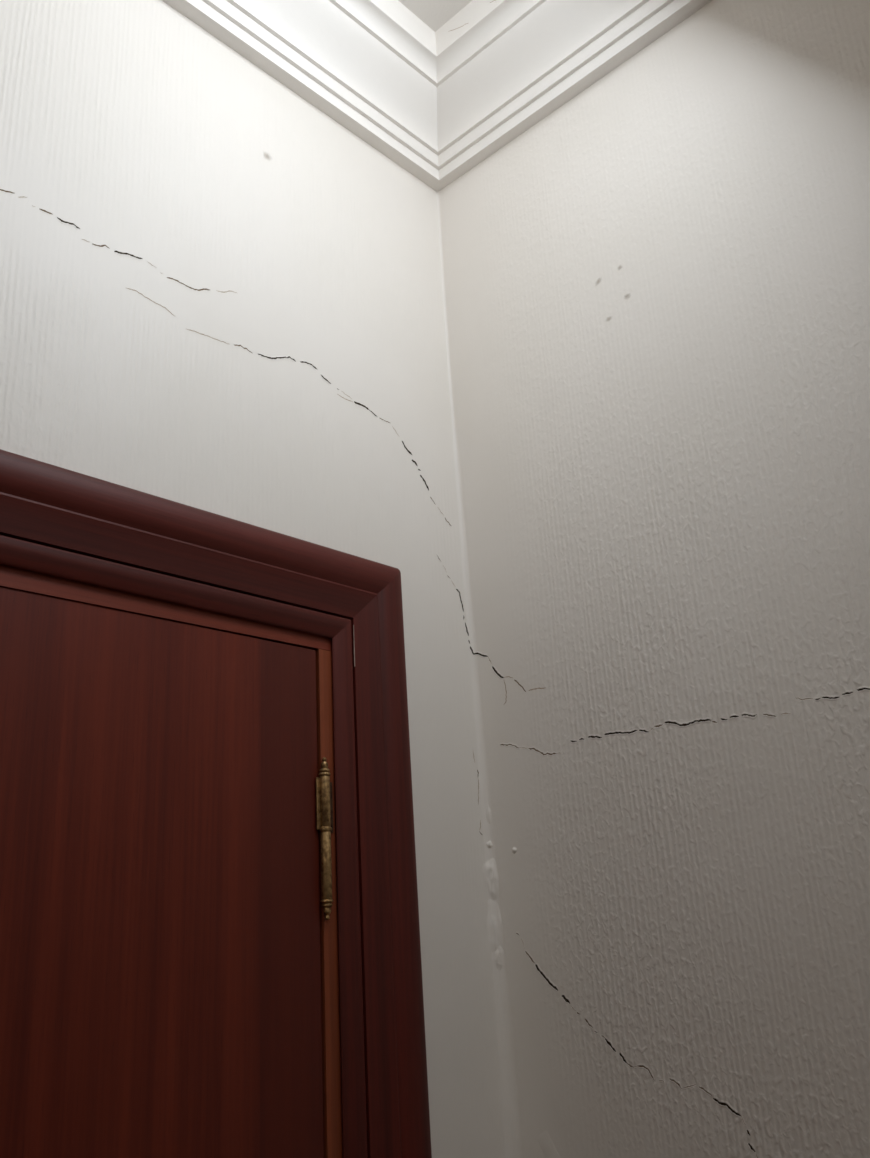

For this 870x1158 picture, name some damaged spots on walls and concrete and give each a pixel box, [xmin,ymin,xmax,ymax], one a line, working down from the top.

crack [0,188,452,527]
crack [436,554,544,704]
crack [472,686,870,836]
crack [516,932,759,1158]